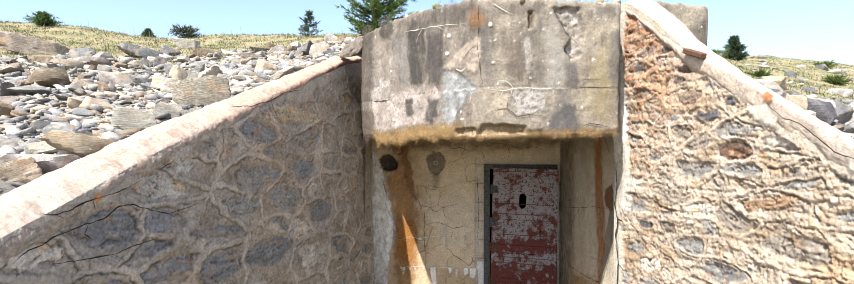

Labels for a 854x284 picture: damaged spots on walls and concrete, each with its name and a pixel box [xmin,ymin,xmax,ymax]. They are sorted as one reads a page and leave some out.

crack [12,158,199,264]
leakage [368,151,395,284]
leakage [361,2,473,139]
leakage [420,138,460,147]
crack [401,176,479,284]
rust [374,123,604,284]
leakage [471,63,588,284]
crack [768,104,854,159]